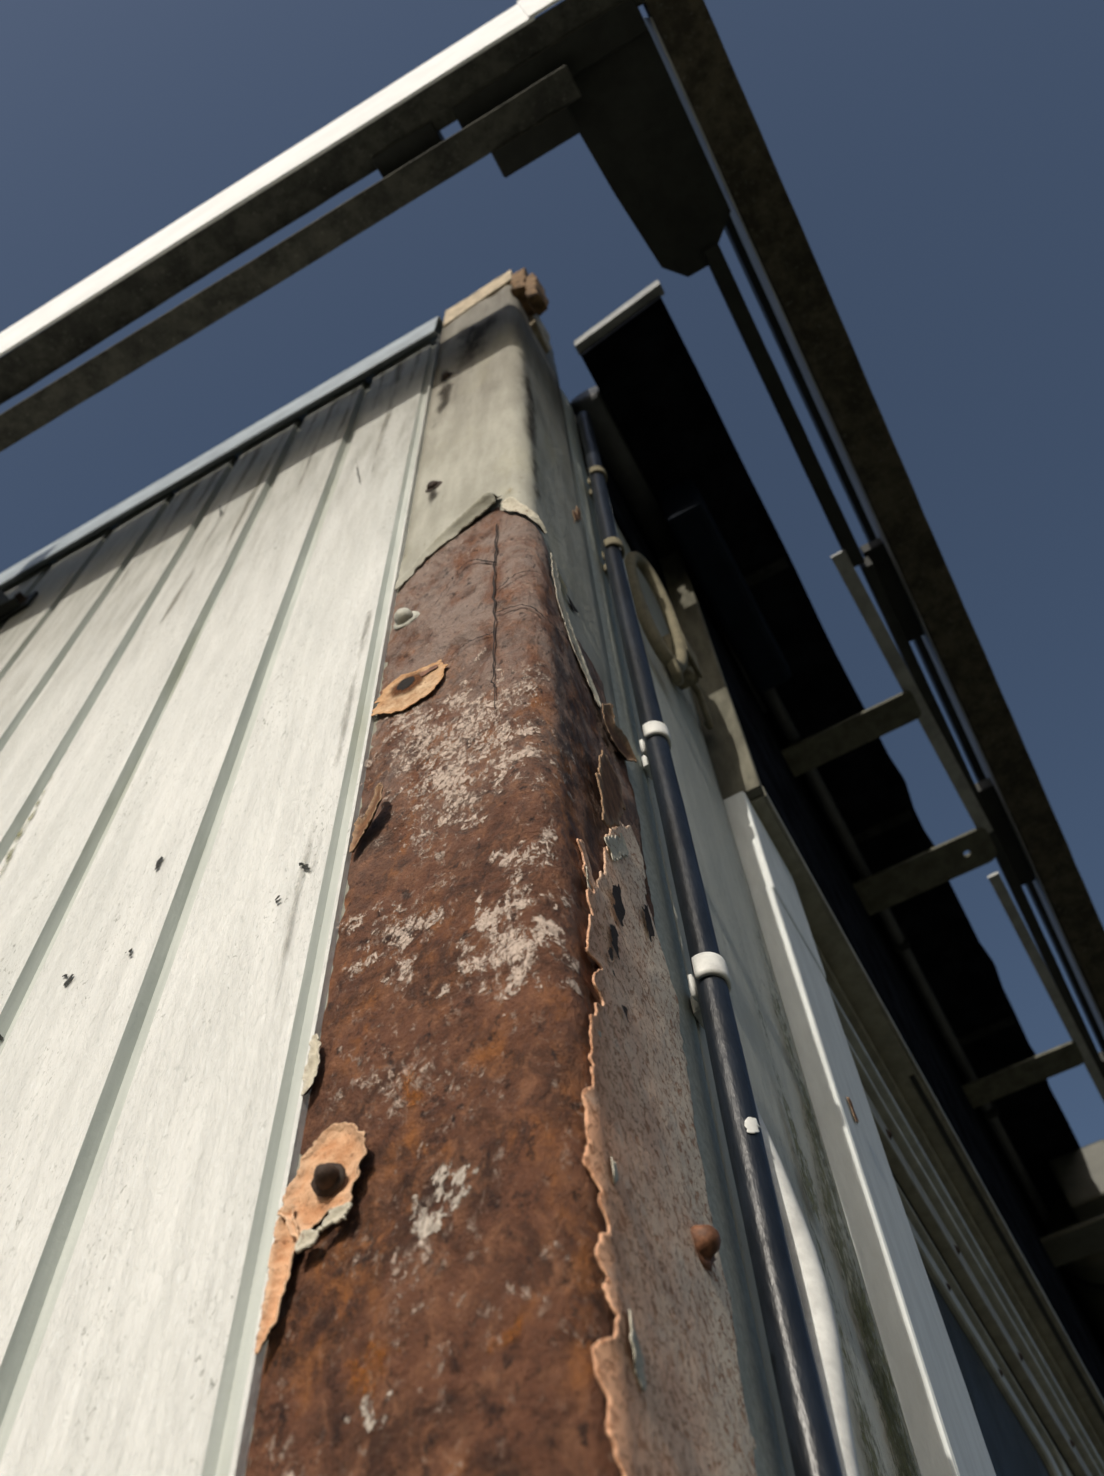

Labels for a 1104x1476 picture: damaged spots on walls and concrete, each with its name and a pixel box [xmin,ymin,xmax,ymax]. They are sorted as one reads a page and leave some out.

peeling [371,660,449,717]
rust [245,507,656,1476]
peeling [395,492,547,590]
peeling [550,553,757,1476]